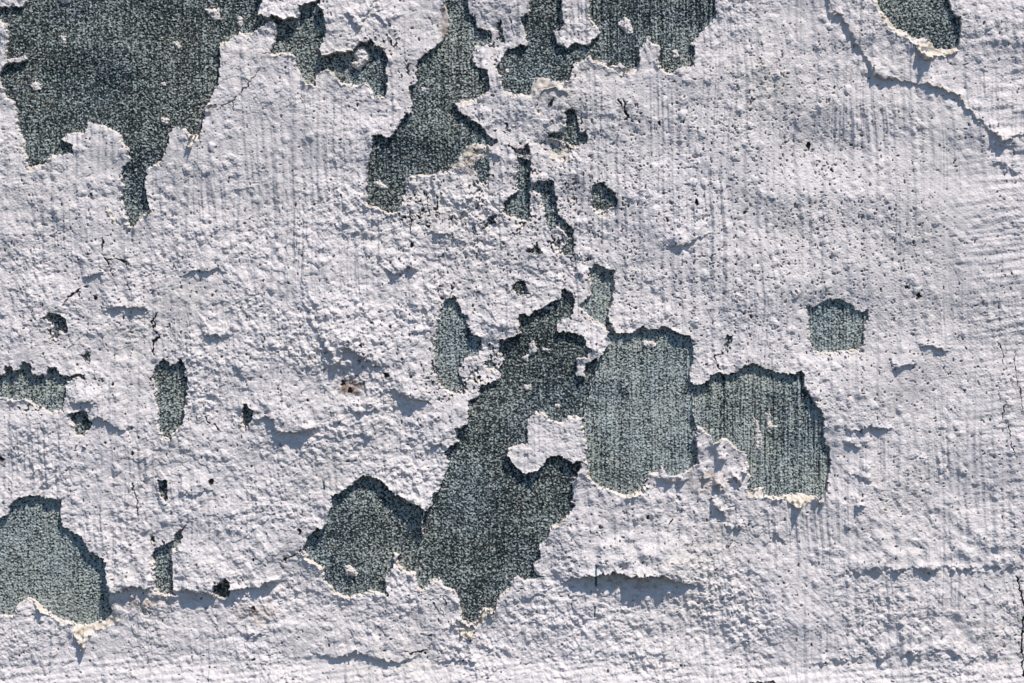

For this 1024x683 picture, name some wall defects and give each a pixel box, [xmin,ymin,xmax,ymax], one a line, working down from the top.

peeling [0,0,401,228]
peeling [364,0,718,258]
peeling [829,0,1024,141]
peeling [0,351,104,437]
peeling [148,358,189,442]
peeling [297,263,832,641]
peeling [803,298,871,360]
peeling [0,495,121,653]
peeling [151,531,183,597]